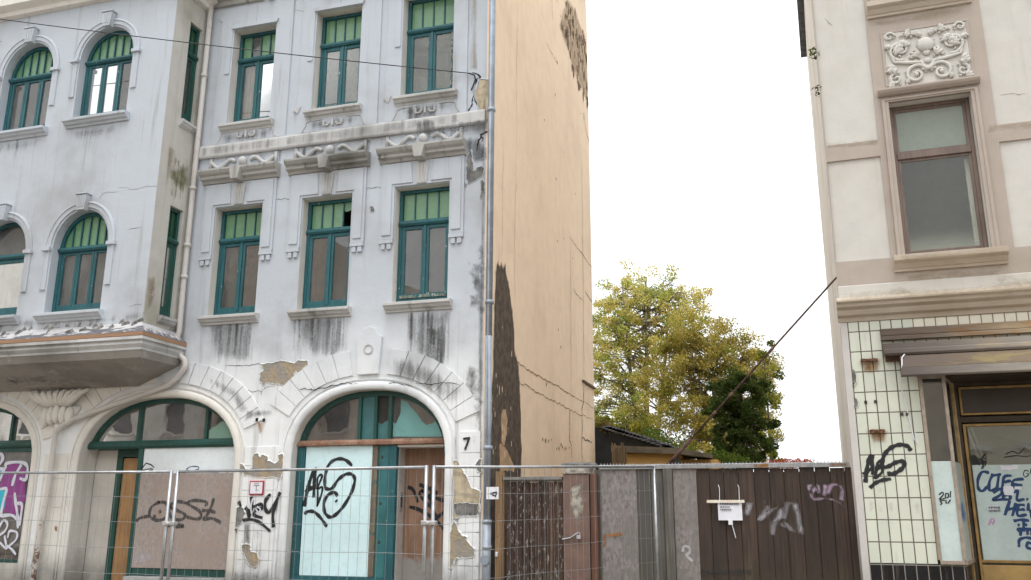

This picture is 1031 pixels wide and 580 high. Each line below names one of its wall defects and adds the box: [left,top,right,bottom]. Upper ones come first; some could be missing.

flaking render [560,0,589,108]
flaking render [239,452,284,479]
flaking render [259,359,309,387]
peeling [449,263,522,580]
crack [517,361,592,462]